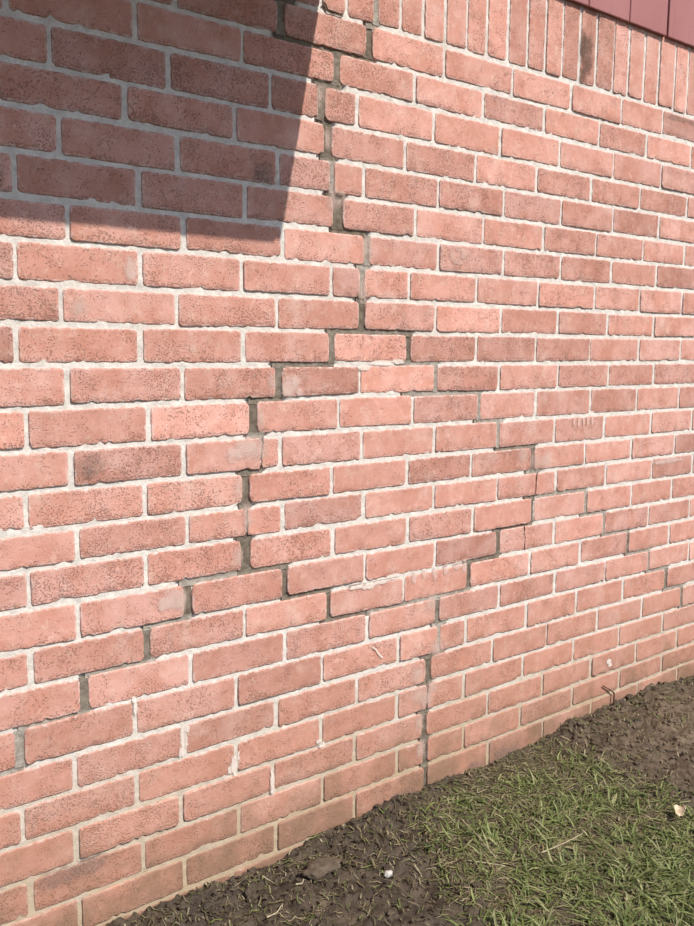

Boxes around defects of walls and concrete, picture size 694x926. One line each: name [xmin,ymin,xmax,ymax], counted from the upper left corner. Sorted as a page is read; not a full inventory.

damp [581,37,593,80]
crack [246,0,540,474]
crack [0,463,694,786]